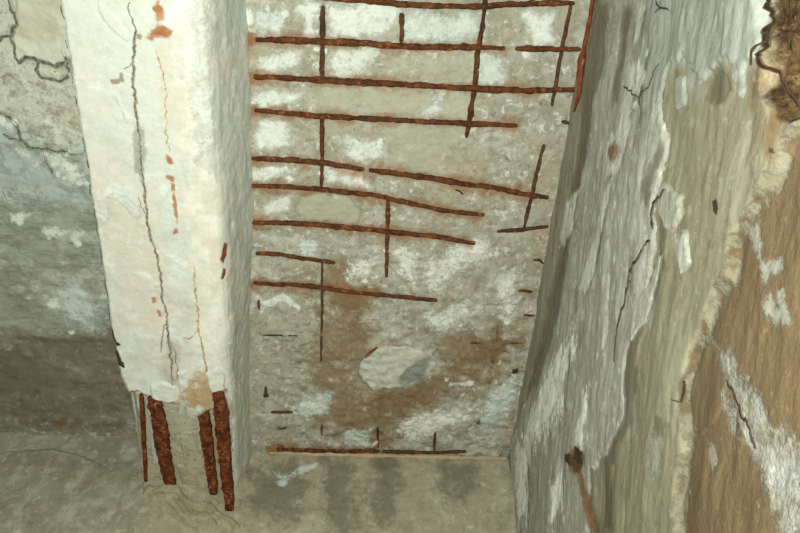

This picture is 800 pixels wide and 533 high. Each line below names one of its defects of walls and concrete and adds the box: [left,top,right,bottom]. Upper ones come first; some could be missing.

corrosion [149,1,171,40]
crack [0,0,110,322]
crack [124,2,208,386]
corrosion [166,175,178,218]
peeling [294,192,362,225]
crack [613,189,665,362]
peeling [509,0,800,533]
spalling [112,329,223,493]
corrosion [184,372,228,484]
peeling [203,366,234,477]
damp [396,375,523,445]
crack [726,379,755,449]